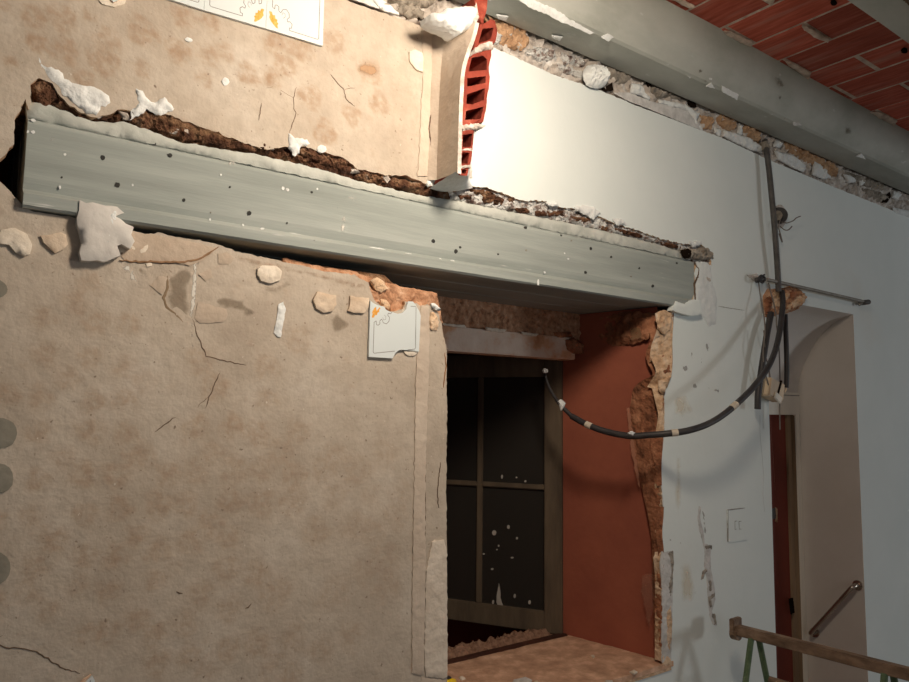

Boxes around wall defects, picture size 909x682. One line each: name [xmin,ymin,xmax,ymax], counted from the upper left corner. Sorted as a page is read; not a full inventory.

spalling [372,0,399,16]
spalling [25,80,714,267]
spalling [714,123,762,154]
spalling [773,140,831,179]
spalling [882,191,909,217]
flaking render [282,258,584,354]
crack [193,320,244,407]
spalling [599,310,674,682]
peeling [701,569,717,625]
crack [0,636,80,674]